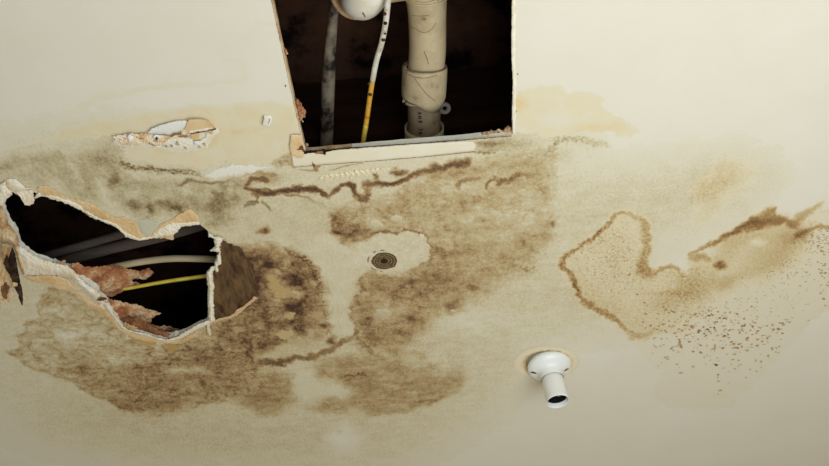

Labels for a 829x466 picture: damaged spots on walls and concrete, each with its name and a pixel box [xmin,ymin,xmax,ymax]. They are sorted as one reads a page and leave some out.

damp [0,20,302,169]
damp [515,84,640,139]
peeling [6,178,34,191]
peeling [205,164,272,180]
flaking render [17,246,207,353]
damp [0,128,829,466]